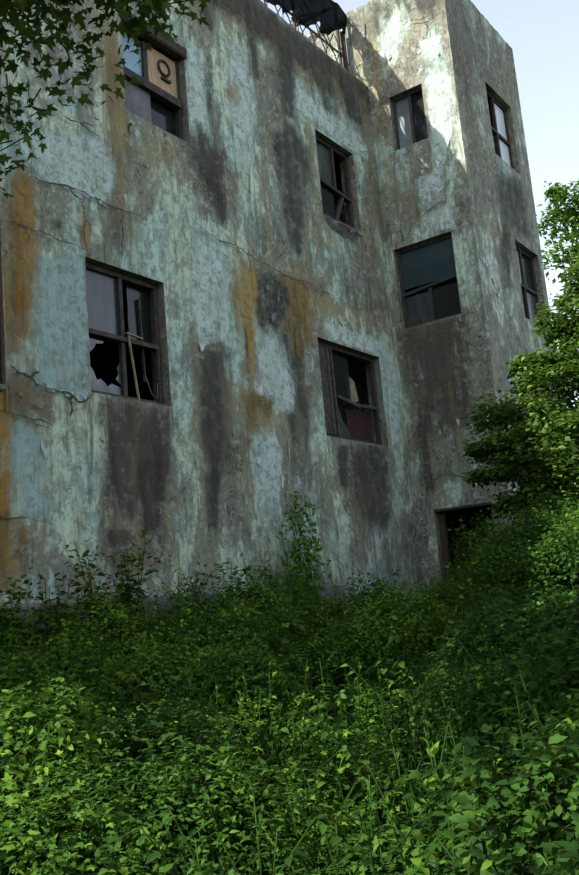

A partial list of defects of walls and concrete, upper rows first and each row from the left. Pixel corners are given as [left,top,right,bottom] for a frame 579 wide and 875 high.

rust [0,392,28,591]
rust [4,172,36,350]
crack [0,365,94,428]
crack [0,176,146,259]
leakage [107,400,170,531]
leakage [191,74,227,223]
leakage [201,350,224,527]
rust [235,267,260,378]
leakage [204,0,369,254]
leakage [339,444,389,526]